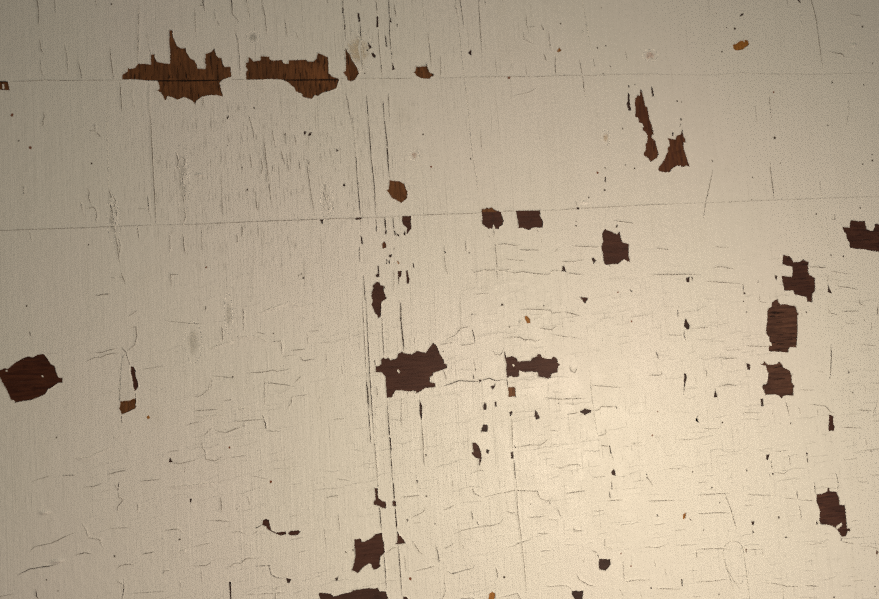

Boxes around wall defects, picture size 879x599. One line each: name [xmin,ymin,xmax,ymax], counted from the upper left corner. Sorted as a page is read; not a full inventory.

peeling [121,29,233,106]
peeling [244,48,365,100]
crack [427,0,879,126]
peeling [0,352,64,404]
crack [0,0,642,599]
peeling [374,341,448,422]
crack [443,161,879,295]
crack [651,245,768,304]
crack [679,343,879,491]
peeling [746,254,816,407]
crack [619,449,819,599]
peeling [815,487,852,538]